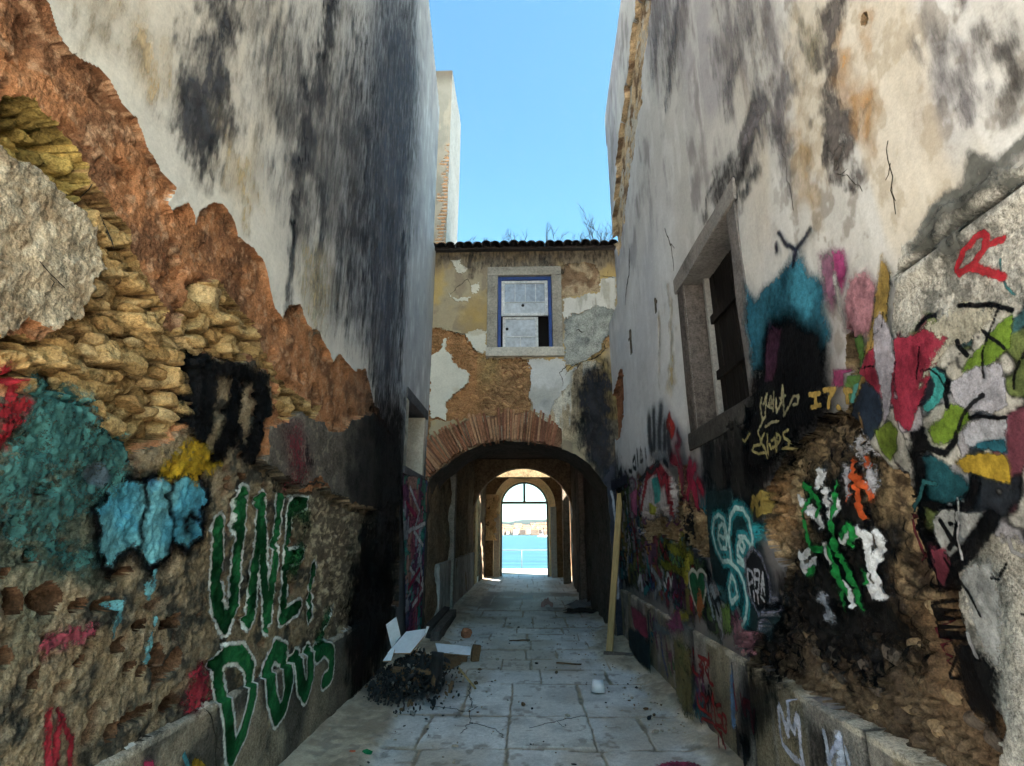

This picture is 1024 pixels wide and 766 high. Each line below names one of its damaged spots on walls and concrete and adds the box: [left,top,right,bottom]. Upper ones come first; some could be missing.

leakage [252,0,419,407]
peeling [451,260,467,273]
spalling [561,262,617,319]
spalling [612,0,652,256]
leakage [735,89,790,189]
leakage [798,0,864,194]
crack [886,141,896,214]
leakage [906,135,1024,258]
mould [972,24,1024,122]
spalling [0,0,377,766]
spalling [426,327,610,485]
spalling [750,405,1007,766]